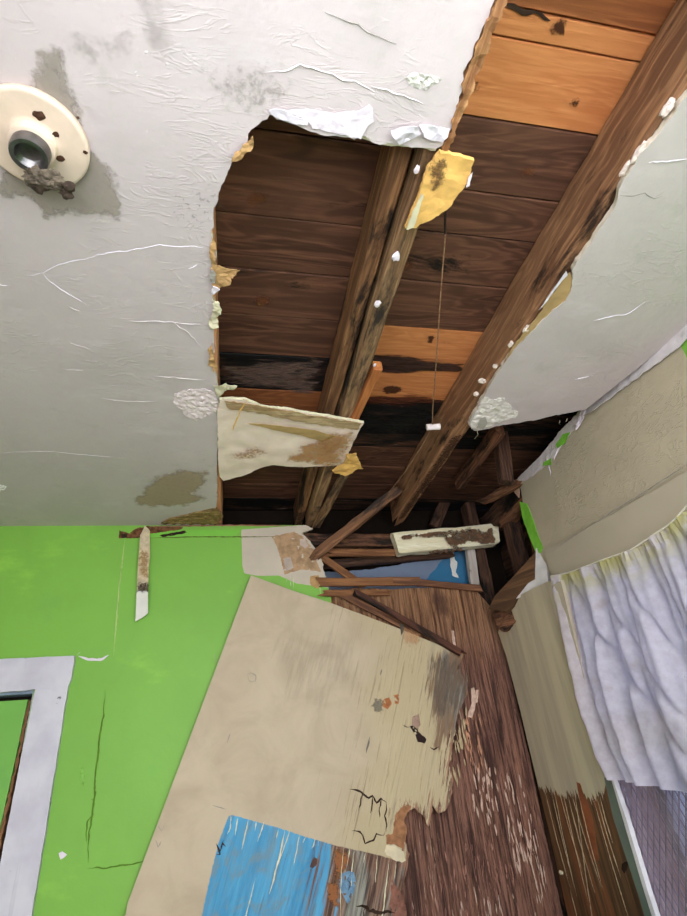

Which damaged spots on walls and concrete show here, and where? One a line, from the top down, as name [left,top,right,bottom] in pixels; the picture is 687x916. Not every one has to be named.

peeling [269,105,374,139]
peeling [391,125,449,145]
peeling [173,388,219,421]
peeling [470,396,518,437]
leakage [135,471,207,506]
peeling [514,410,586,553]
crack [86,699,143,869]
crack [350,789,387,844]